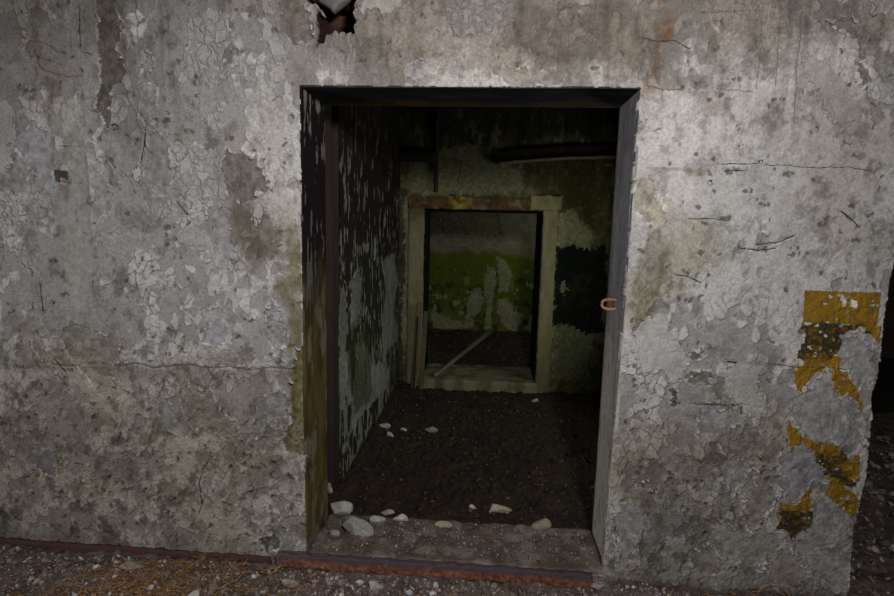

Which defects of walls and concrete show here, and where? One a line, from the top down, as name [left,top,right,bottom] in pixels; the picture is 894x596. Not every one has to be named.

flaking render [95,0,126,131]
peeling [174,7,231,134]
spalling [257,0,404,61]
peeling [0,99,57,197]
peeling [139,129,271,274]
flaking render [59,320,121,397]
flaking render [194,343,256,368]
peeling [630,315,767,441]
peeling [840,294,857,308]
peeling [720,328,875,596]